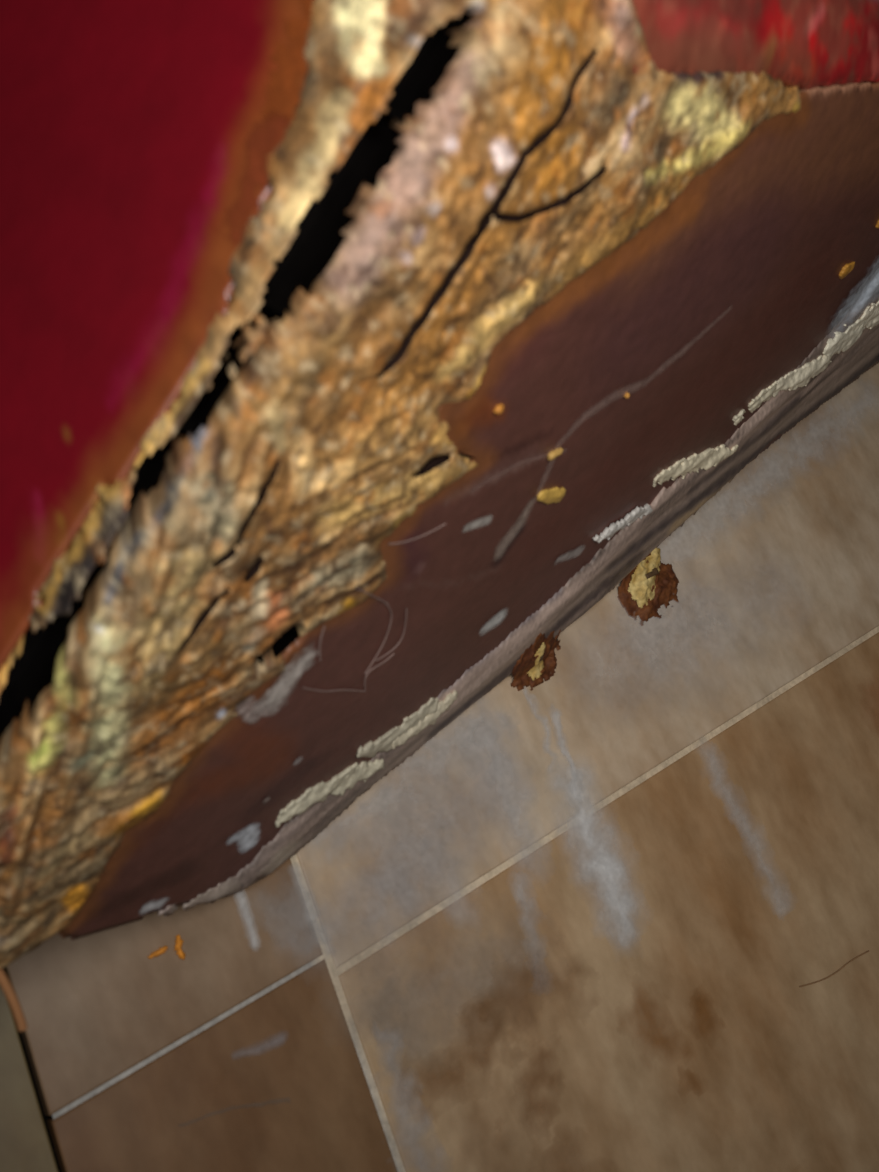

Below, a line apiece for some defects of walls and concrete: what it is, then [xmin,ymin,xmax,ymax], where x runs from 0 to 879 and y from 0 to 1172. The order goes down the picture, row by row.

crack [128,10,475,511]
crack [377,49,607,379]
peeling [732,301,879,426]
peeling [652,444,739,487]
crack [0,543,111,739]
crack [176,460,280,654]
peeling [481,611,506,632]
rust [511,630,561,691]
peeling [556,503,653,562]
rust [617,547,679,627]
peeling [275,690,458,827]
peeling [229,825,259,851]